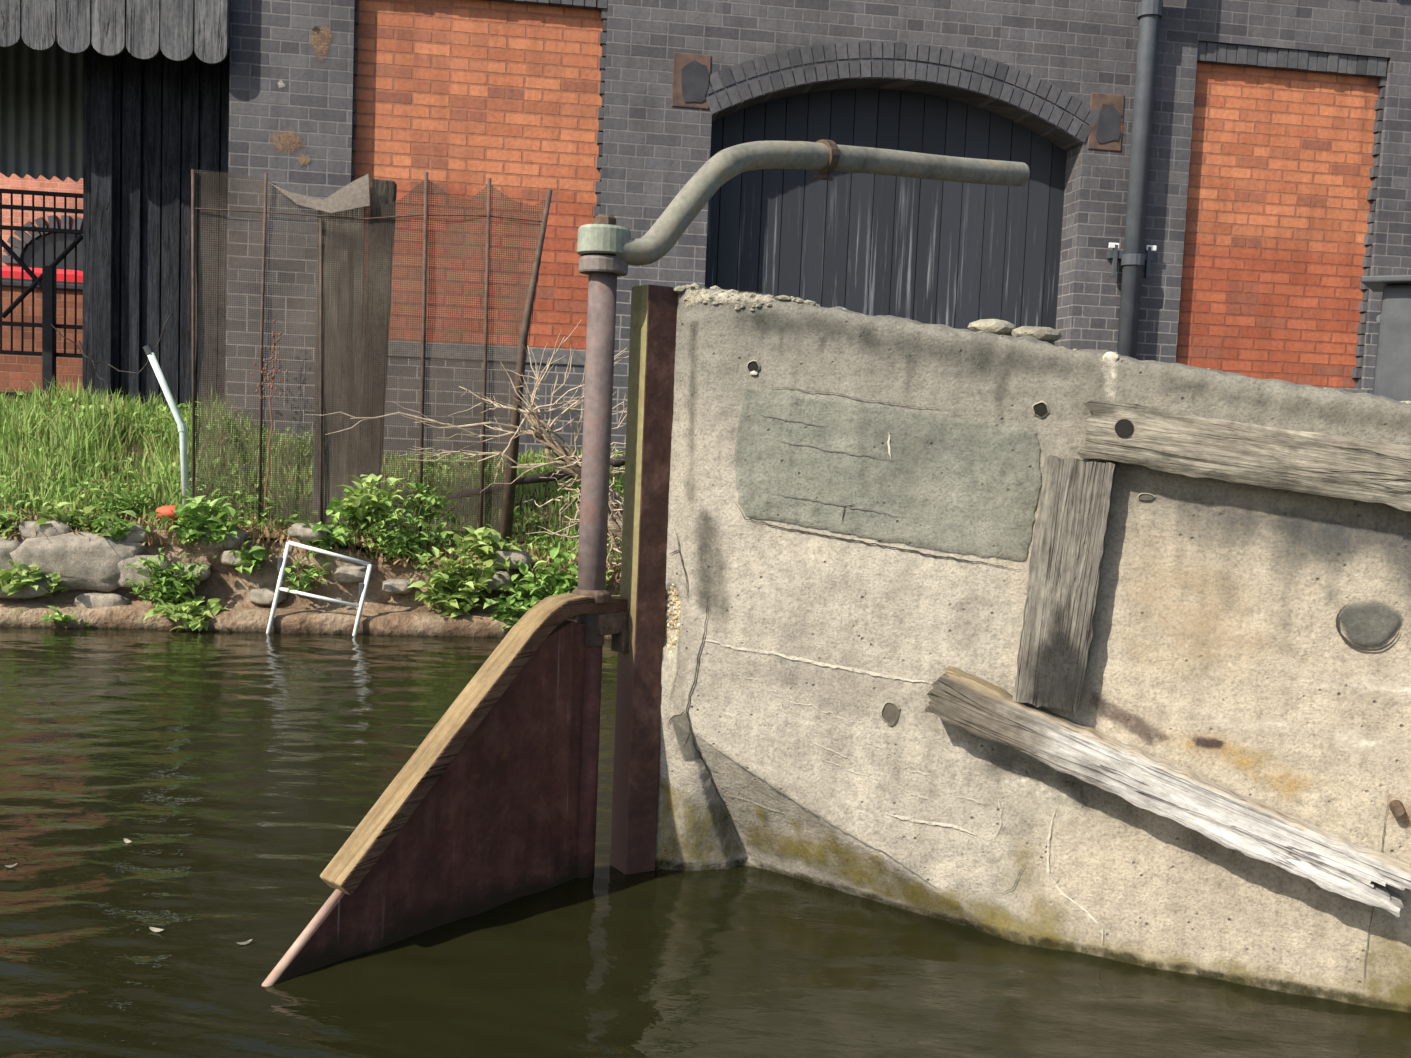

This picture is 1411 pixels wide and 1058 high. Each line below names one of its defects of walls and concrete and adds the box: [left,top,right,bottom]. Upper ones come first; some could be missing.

crack [666,531,953,898]
rust [1093,694,1162,742]
rust [1194,737,1222,747]
damp [655,760,1411,1013]